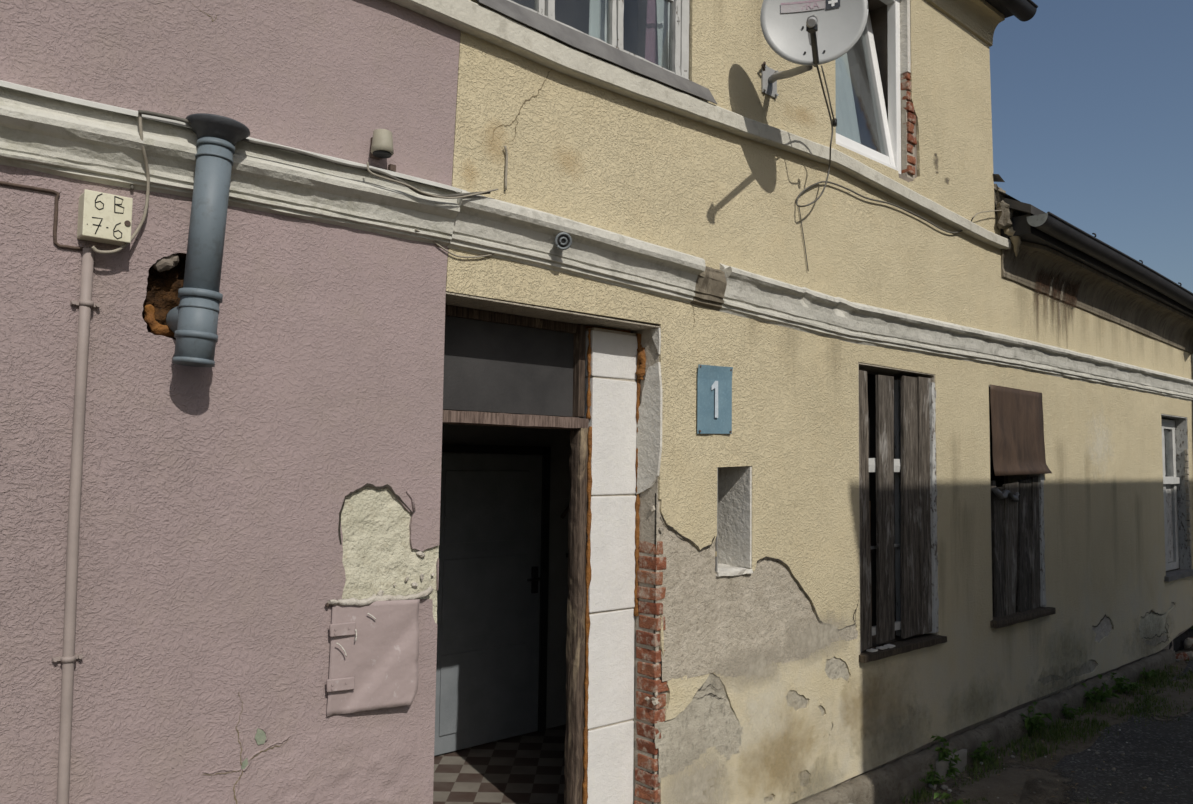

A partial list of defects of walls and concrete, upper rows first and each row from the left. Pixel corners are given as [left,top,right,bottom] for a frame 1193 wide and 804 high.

crack [491,71,550,143]
flaking render [338,483,439,623]
flaking render [655,509,858,782]